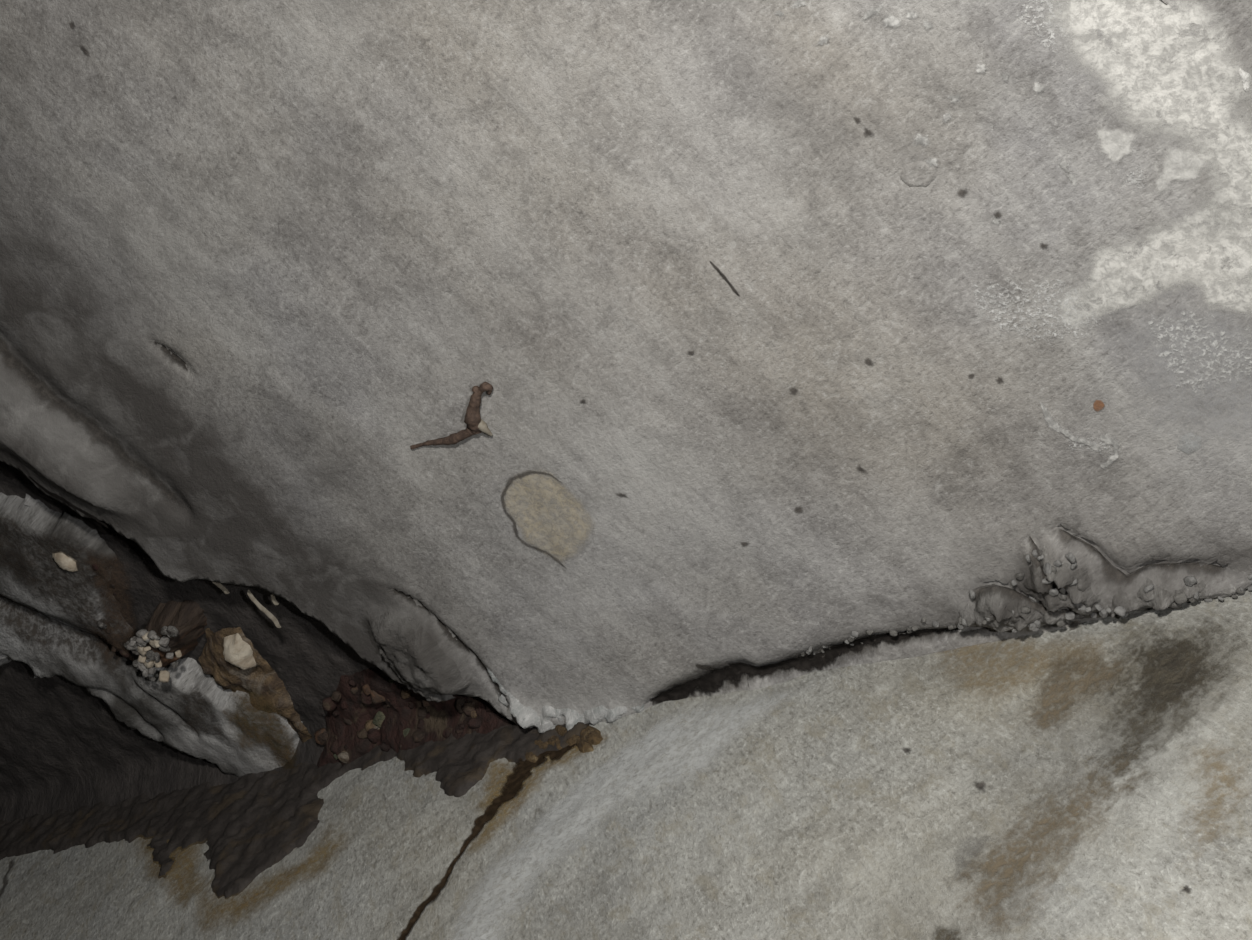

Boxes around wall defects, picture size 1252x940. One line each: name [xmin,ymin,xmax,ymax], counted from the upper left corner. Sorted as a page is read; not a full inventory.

spalling [0,470,65,513]
peeling [501,470,591,567]
crack [651,617,987,703]
crack [1042,618,1084,628]
crack [1188,575,1252,603]
spalling [0,530,590,899]
corrosion [480,725,603,842]
leakage [961,627,1234,925]
crack [397,744,577,940]